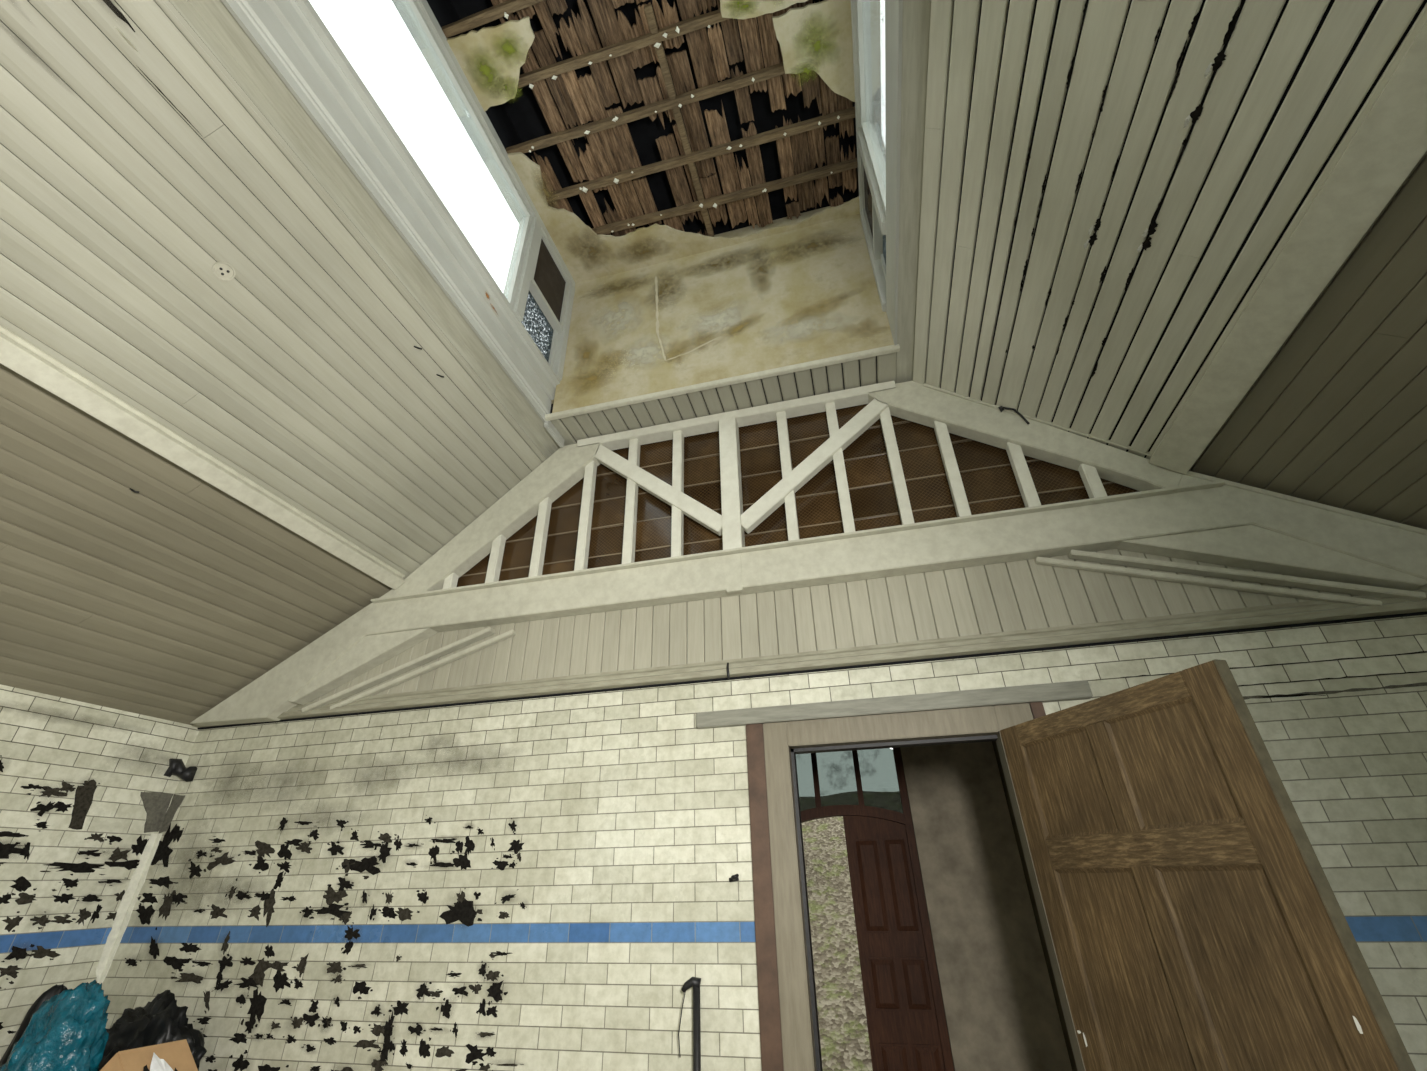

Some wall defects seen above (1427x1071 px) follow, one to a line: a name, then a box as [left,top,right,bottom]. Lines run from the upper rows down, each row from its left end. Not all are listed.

leakage [730,0,752,11]
leakage [477,39,517,96]
leakage [700,255,768,283]
leakage [696,309,750,346]
spalling [0,779,525,1071]